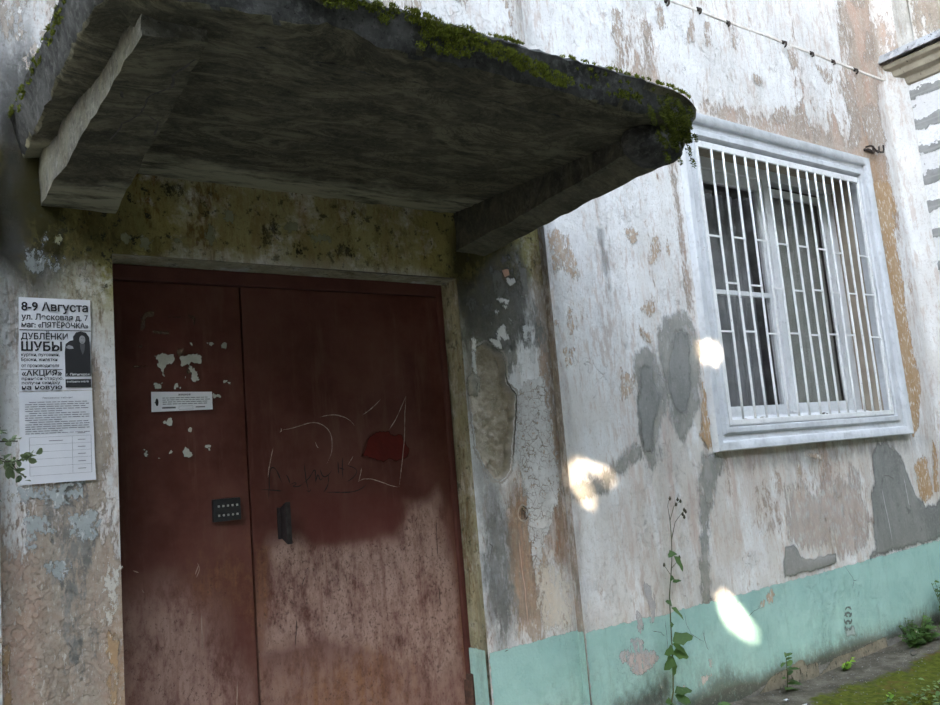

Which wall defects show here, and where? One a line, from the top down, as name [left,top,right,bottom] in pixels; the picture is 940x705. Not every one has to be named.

peeling [610,7,625,74]
peeling [642,2,668,69]
peeling [686,19,713,47]
peeling [787,47,800,71]
peeling [772,106,832,142]
peeling [873,178,921,437]
flaking render [465,324,535,484]
crack [515,375,563,625]
peeling [914,440,939,503]
peeling [99,562,122,628]
peeling [619,581,659,675]